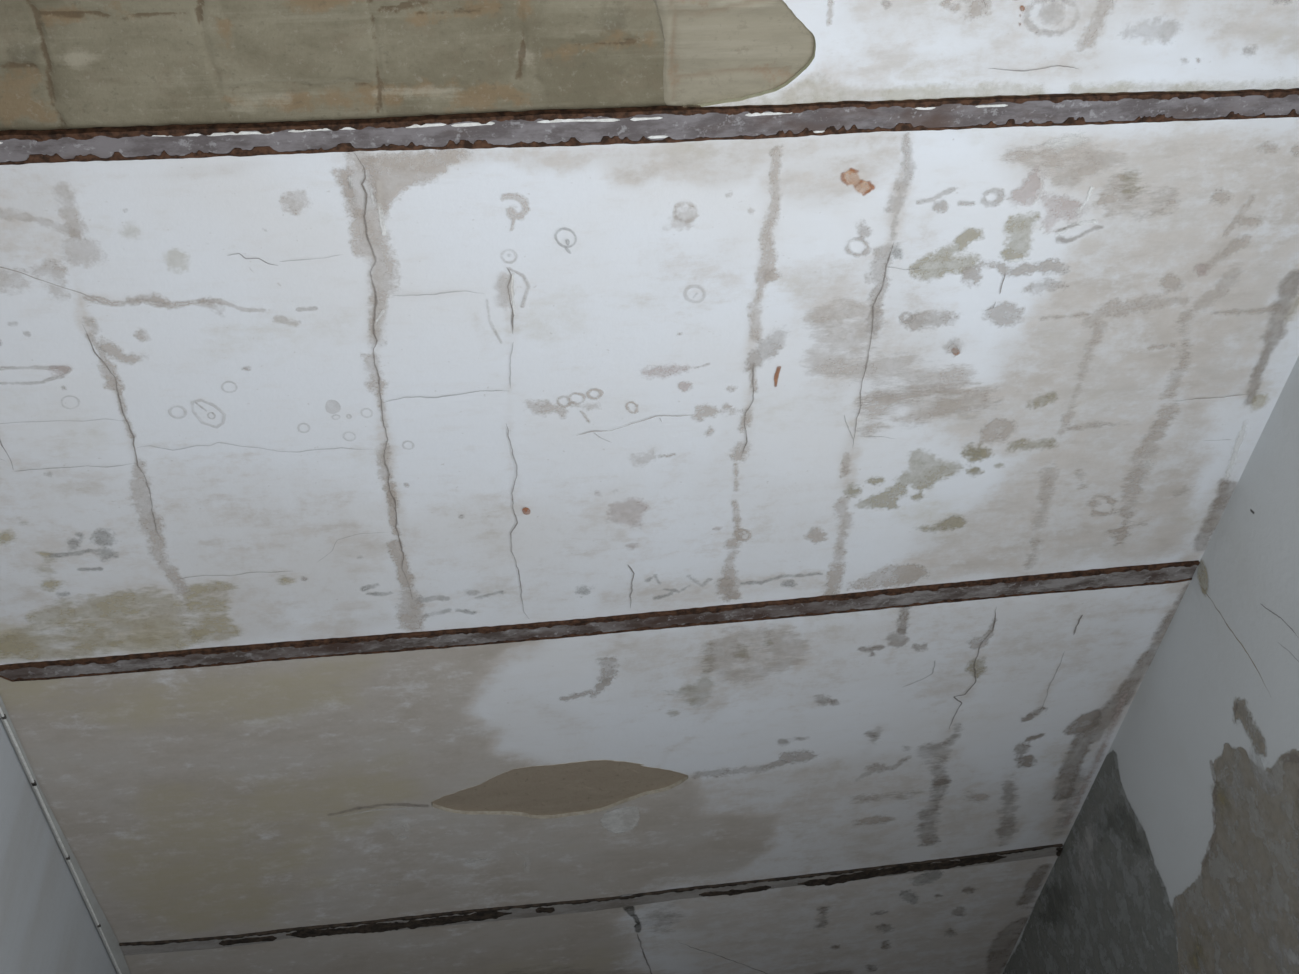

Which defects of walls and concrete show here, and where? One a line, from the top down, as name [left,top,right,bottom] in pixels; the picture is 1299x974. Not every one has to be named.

flaking render [0,0,816,144]
corrosion [0,88,1299,165]
crack [358,159,373,251]
water stain [848,229,1062,290]
crack [1,267,157,532]
crack [373,289,386,429]
water stain [848,466,953,508]
water stain [925,517,966,530]
corrosion [0,560,1207,682]
flaking render [431,760,688,833]
peeling [1003,699,1299,974]
corrosion [119,844,1063,946]